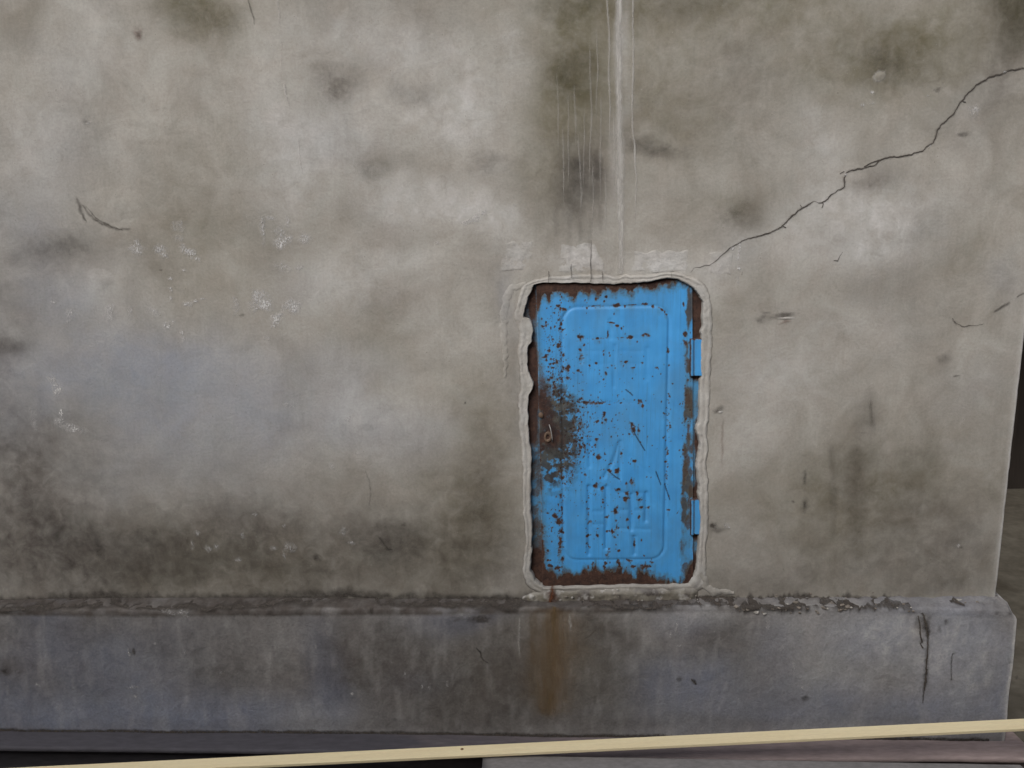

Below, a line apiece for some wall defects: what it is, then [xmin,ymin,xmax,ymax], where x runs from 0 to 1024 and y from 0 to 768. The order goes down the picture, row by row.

water stain [615,0,636,274]
crack [695,68,1022,268]
spalling [732,592,915,615]
crack [918,613,929,699]